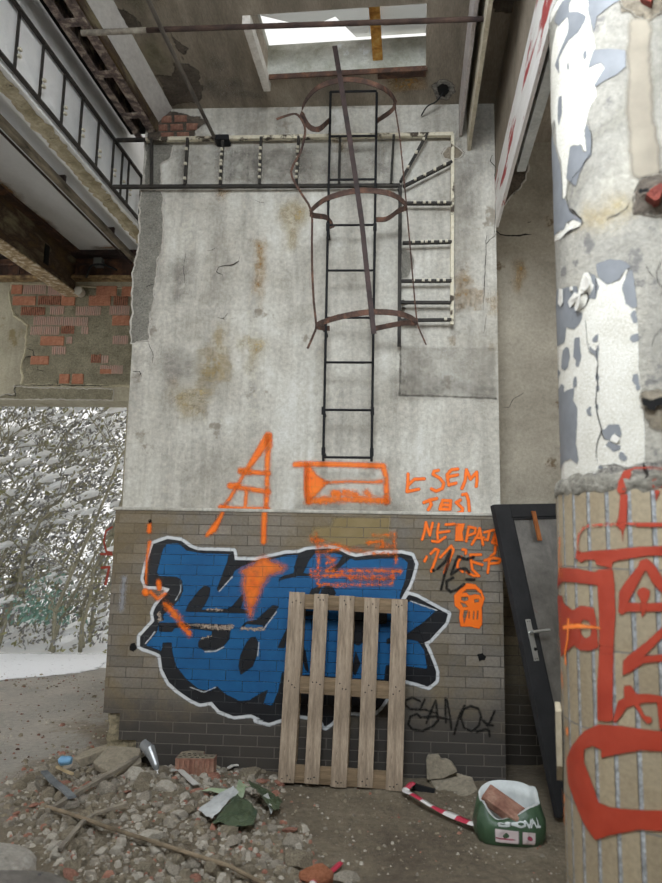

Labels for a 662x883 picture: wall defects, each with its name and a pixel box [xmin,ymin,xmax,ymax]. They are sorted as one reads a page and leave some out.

spalling [554,0,662,218]
spalling [0,35,206,401]
spalling [504,162,530,206]
peeling [551,124,592,236]
peeling [556,259,639,470]
spalling [594,424,662,476]
spalling [632,374,662,432]